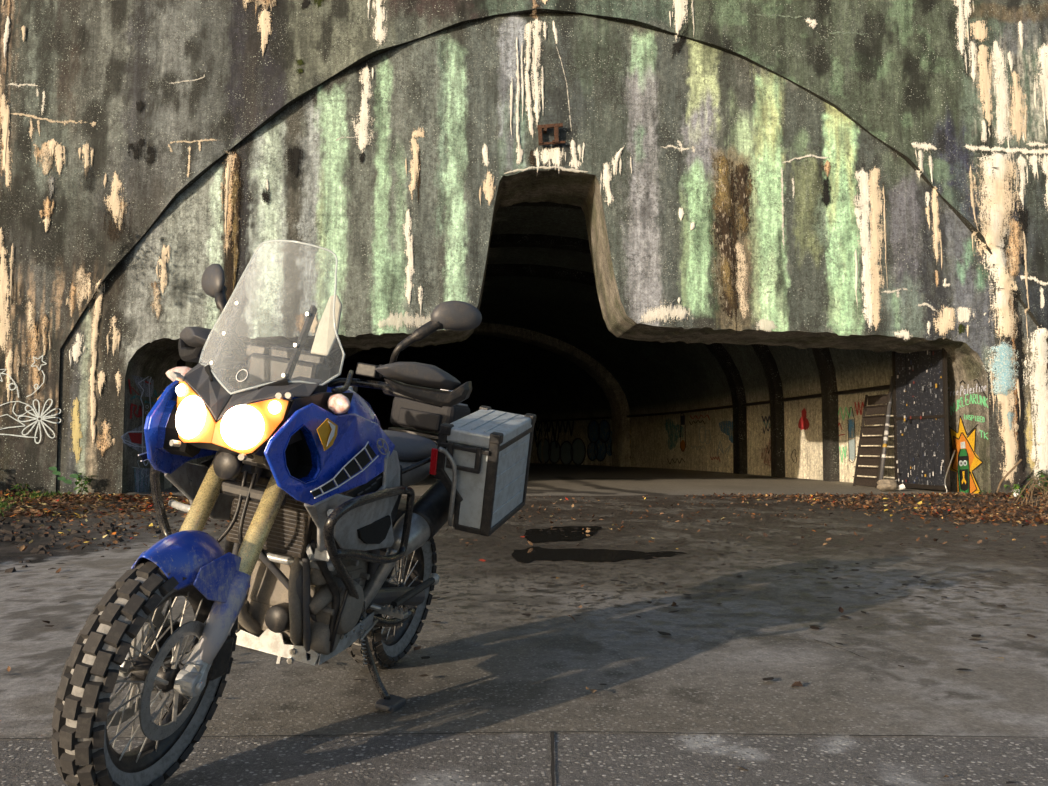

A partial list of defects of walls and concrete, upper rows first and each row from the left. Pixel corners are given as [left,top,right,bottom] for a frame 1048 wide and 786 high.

leakage [350,63,375,162]
leakage [378,209,431,329]
rust [705,155,758,333]
leakage [852,166,888,331]
peeling [982,342,1019,396]